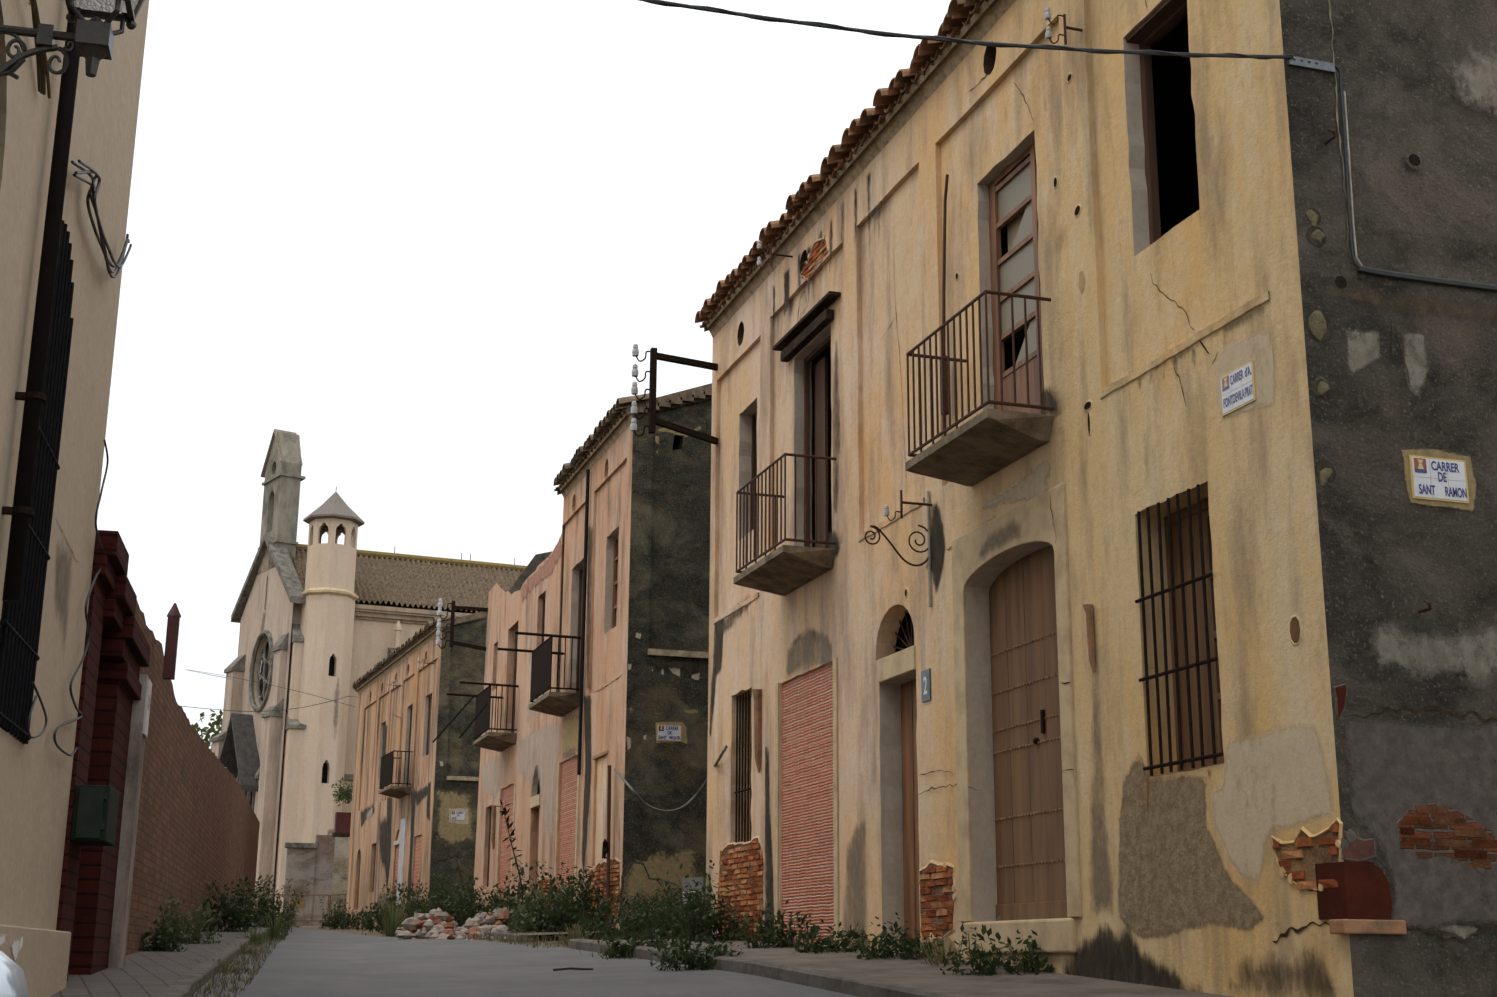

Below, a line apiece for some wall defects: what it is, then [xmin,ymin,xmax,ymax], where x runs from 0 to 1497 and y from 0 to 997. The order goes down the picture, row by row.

damp [648,598,751,736]
crack [1344,705,1497,723]
peeling [1374,627,1497,682]
peeling [588,850,699,922]
flaking render [717,836,765,940]
flaking render [919,860,957,958]
damp [1065,726,1333,997]
flaking render [1271,817,1376,892]
damp [1345,719,1497,929]
flaking render [1396,799,1497,874]